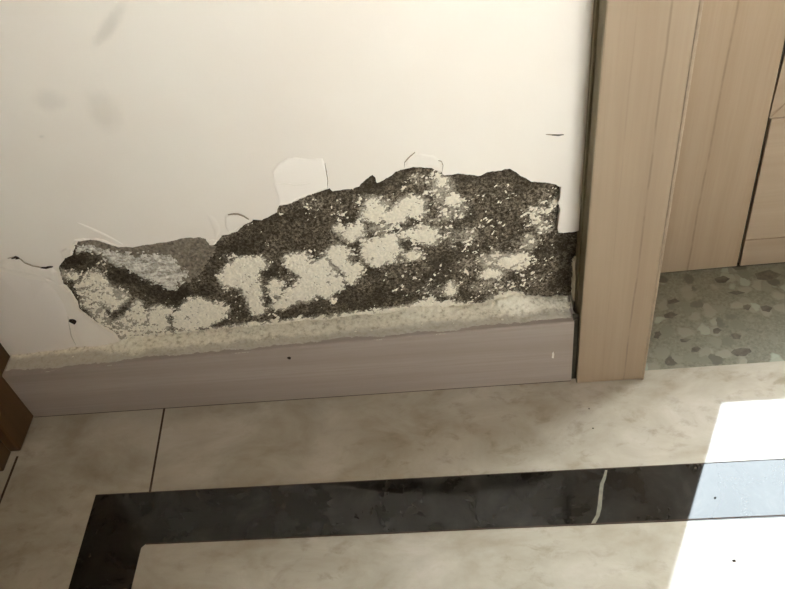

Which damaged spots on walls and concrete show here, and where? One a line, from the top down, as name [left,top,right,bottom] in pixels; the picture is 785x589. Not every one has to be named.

crack [8,256,53,269]
spalling [45,157,577,340]